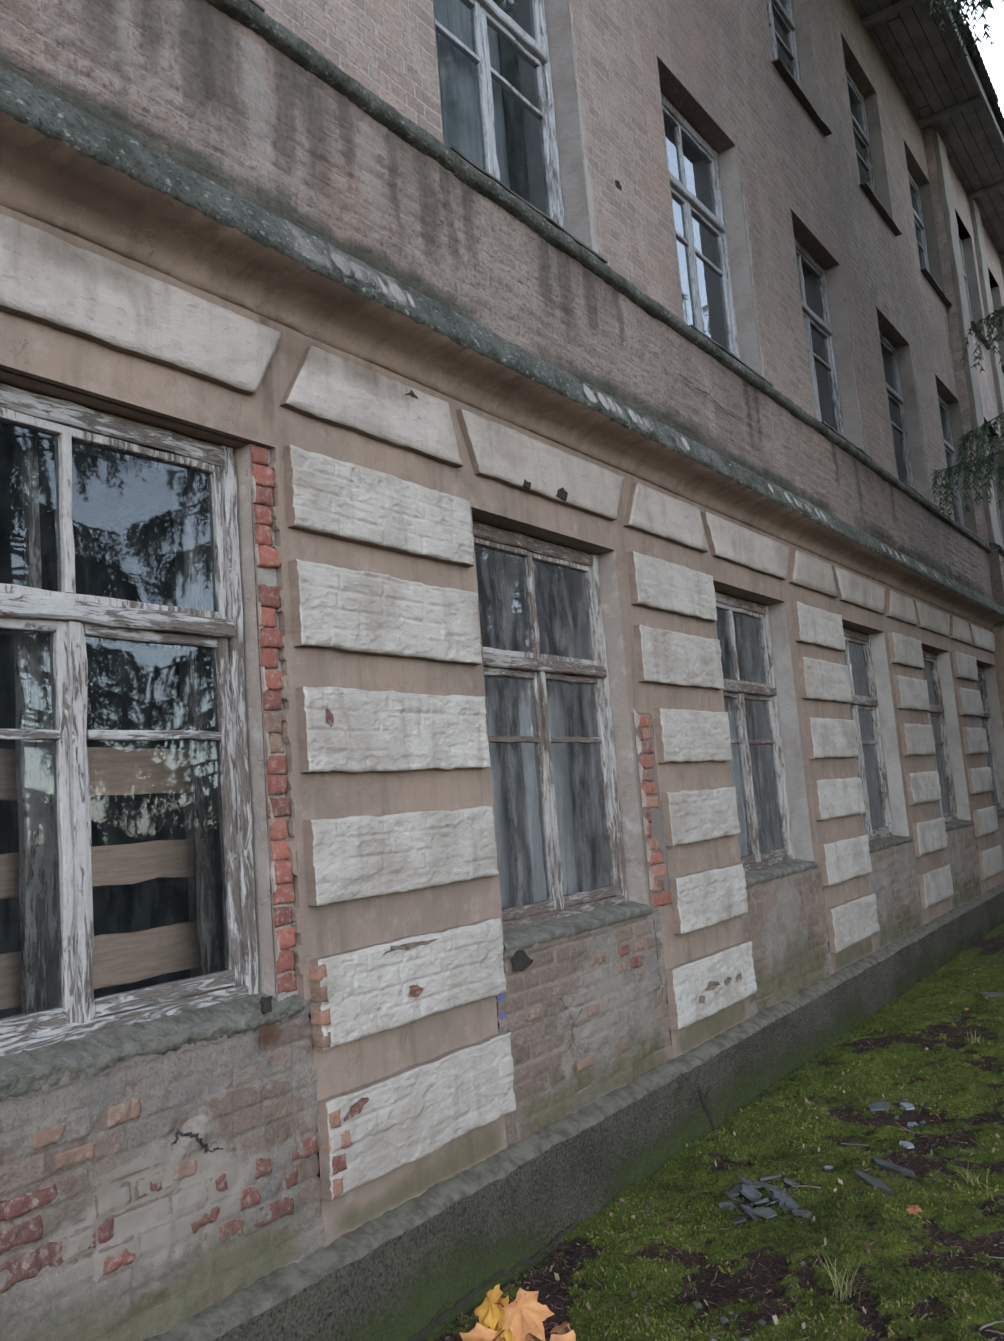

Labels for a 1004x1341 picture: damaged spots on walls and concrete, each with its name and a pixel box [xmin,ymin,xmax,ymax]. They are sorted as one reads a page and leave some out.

damp [577,83,598,253]
damp [333,253,414,305]
spalling [249,443,331,1048]
spalling [0,1096,369,1304]